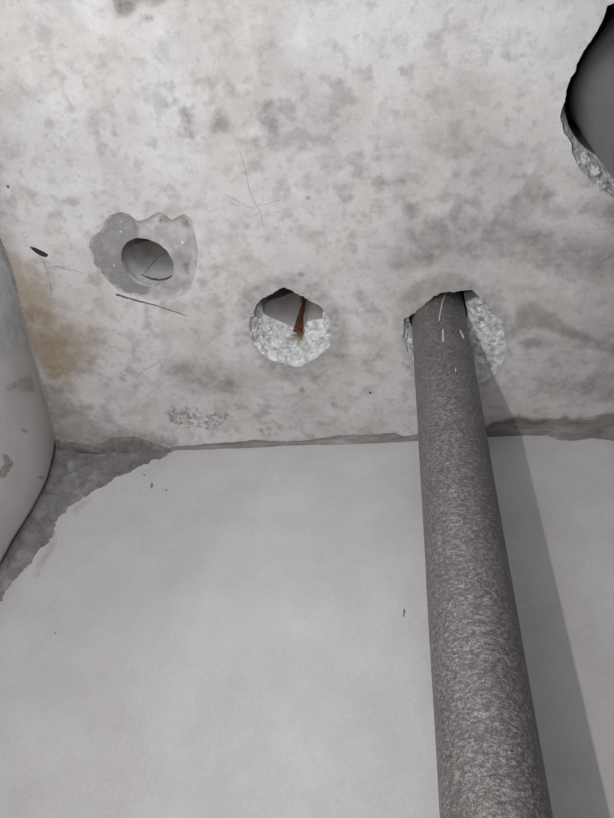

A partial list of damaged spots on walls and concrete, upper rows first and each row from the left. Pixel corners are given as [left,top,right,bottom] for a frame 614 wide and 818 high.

spalling [560,105,614,198]
spalling [89,212,198,300]
spalling [249,287,332,367]
rust [293,296,307,340]
spalling [403,315,414,364]
spalling [462,290,506,383]
peeling [0,437,171,601]